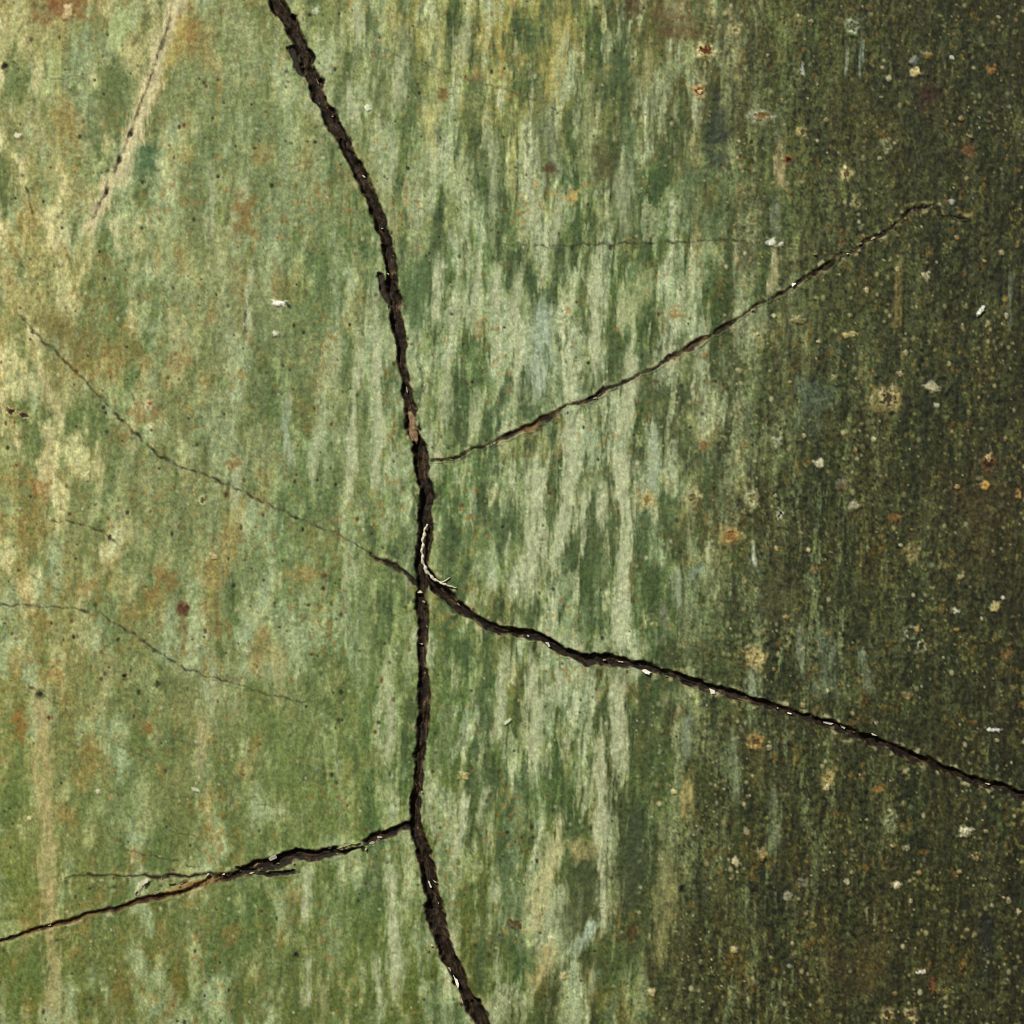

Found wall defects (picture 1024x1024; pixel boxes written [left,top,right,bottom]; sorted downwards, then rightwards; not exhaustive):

crack [22,181,35,220]
crack [86,4,173,234]
crack [16,311,371,555]
crack [267,0,1024,1024]
crack [0,573,310,707]
crack [0,820,414,945]